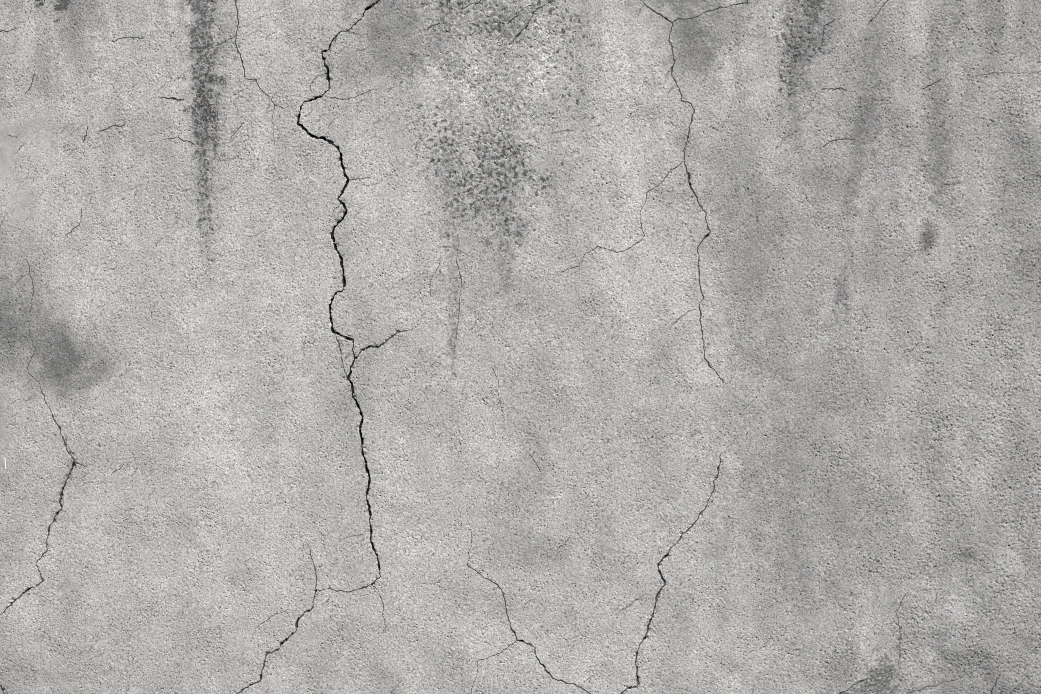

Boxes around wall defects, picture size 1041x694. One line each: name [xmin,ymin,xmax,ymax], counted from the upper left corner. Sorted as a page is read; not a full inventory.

water stain [179,0,226,236]
crack [561,0,748,382]
crack [0,261,87,615]
crack [215,0,413,694]
crack [467,532,596,694]
crack [621,453,722,694]
crack [840,593,907,694]
crack [907,658,1000,694]